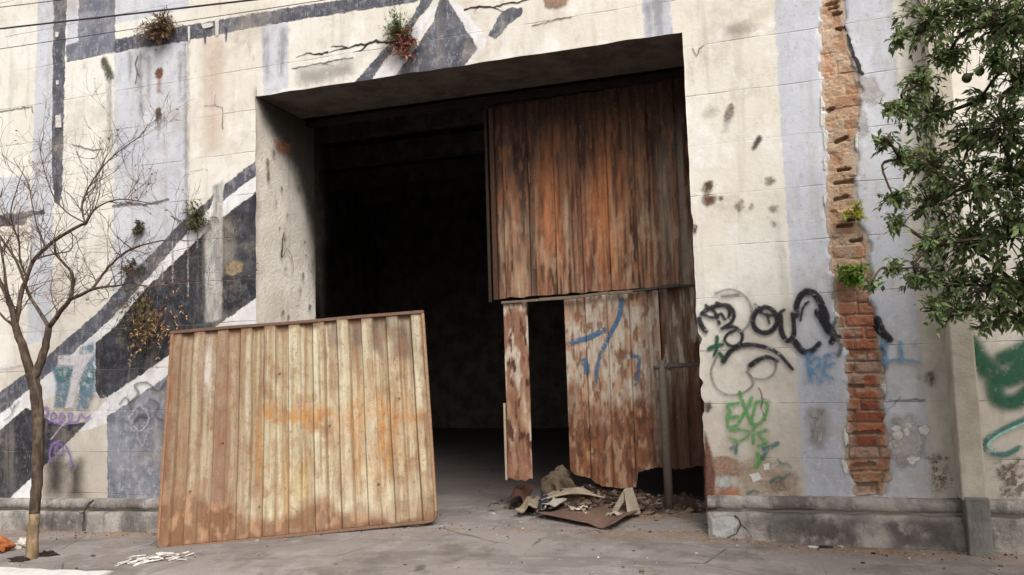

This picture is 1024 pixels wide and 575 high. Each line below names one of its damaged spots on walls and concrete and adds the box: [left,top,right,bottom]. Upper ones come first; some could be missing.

crack [464,0,526,11]
crack [292,39,394,69]
spalling [818,0,948,496]
peeling [738,460,798,496]
crack [727,515,749,538]